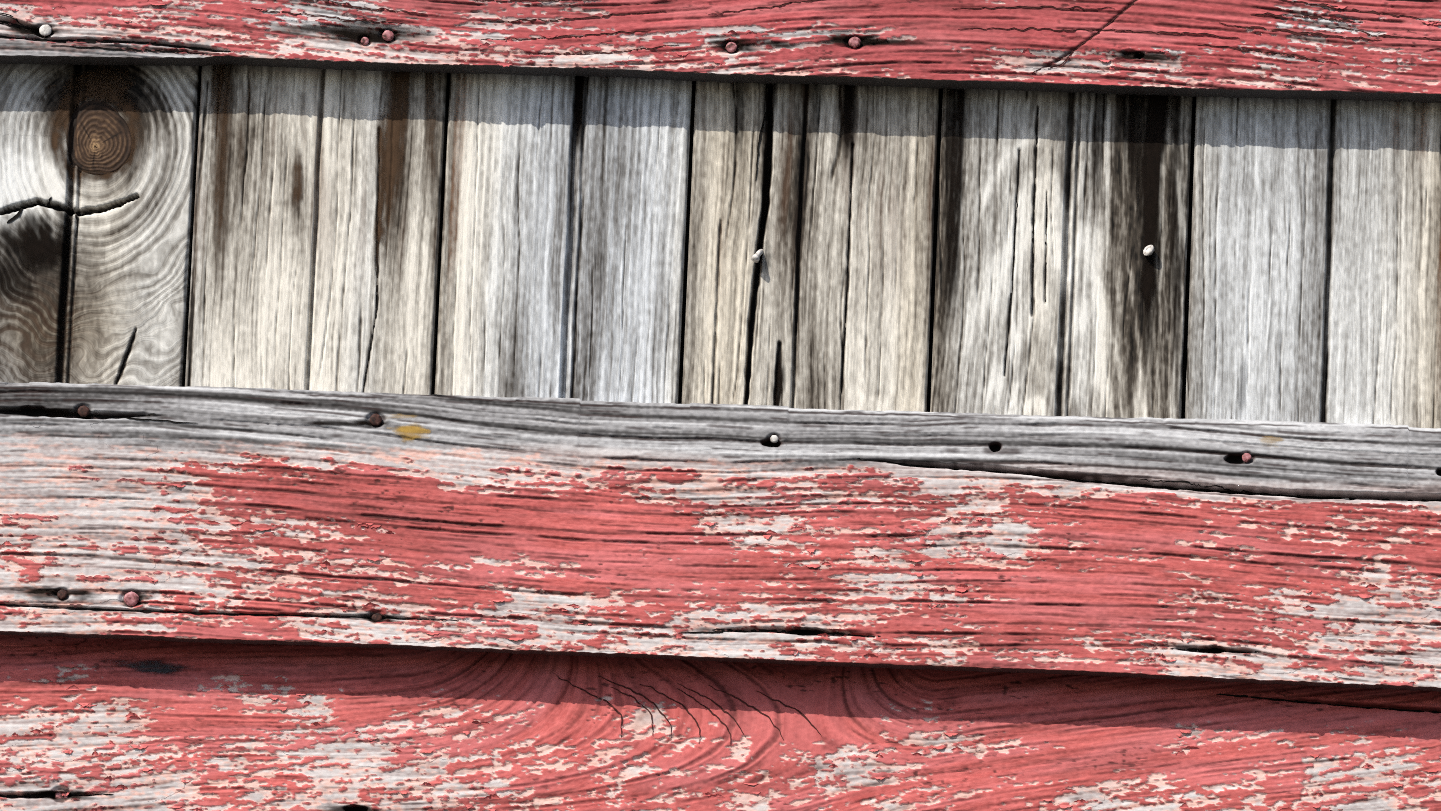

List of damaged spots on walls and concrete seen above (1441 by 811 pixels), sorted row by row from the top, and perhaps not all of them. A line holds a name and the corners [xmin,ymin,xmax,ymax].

crack [475,0,679,55]
crack [953,0,1441,72]
crack [363,133,380,392]
crack [746,103,781,403]
crack [840,145,853,406]
crack [1004,113,1048,373]
peeling [0,419,307,614]
peeling [285,587,687,653]
peeling [706,630,881,660]
peeling [694,505,1052,609]
peeling [1140,578,1441,677]
peeling [0,664,226,811]